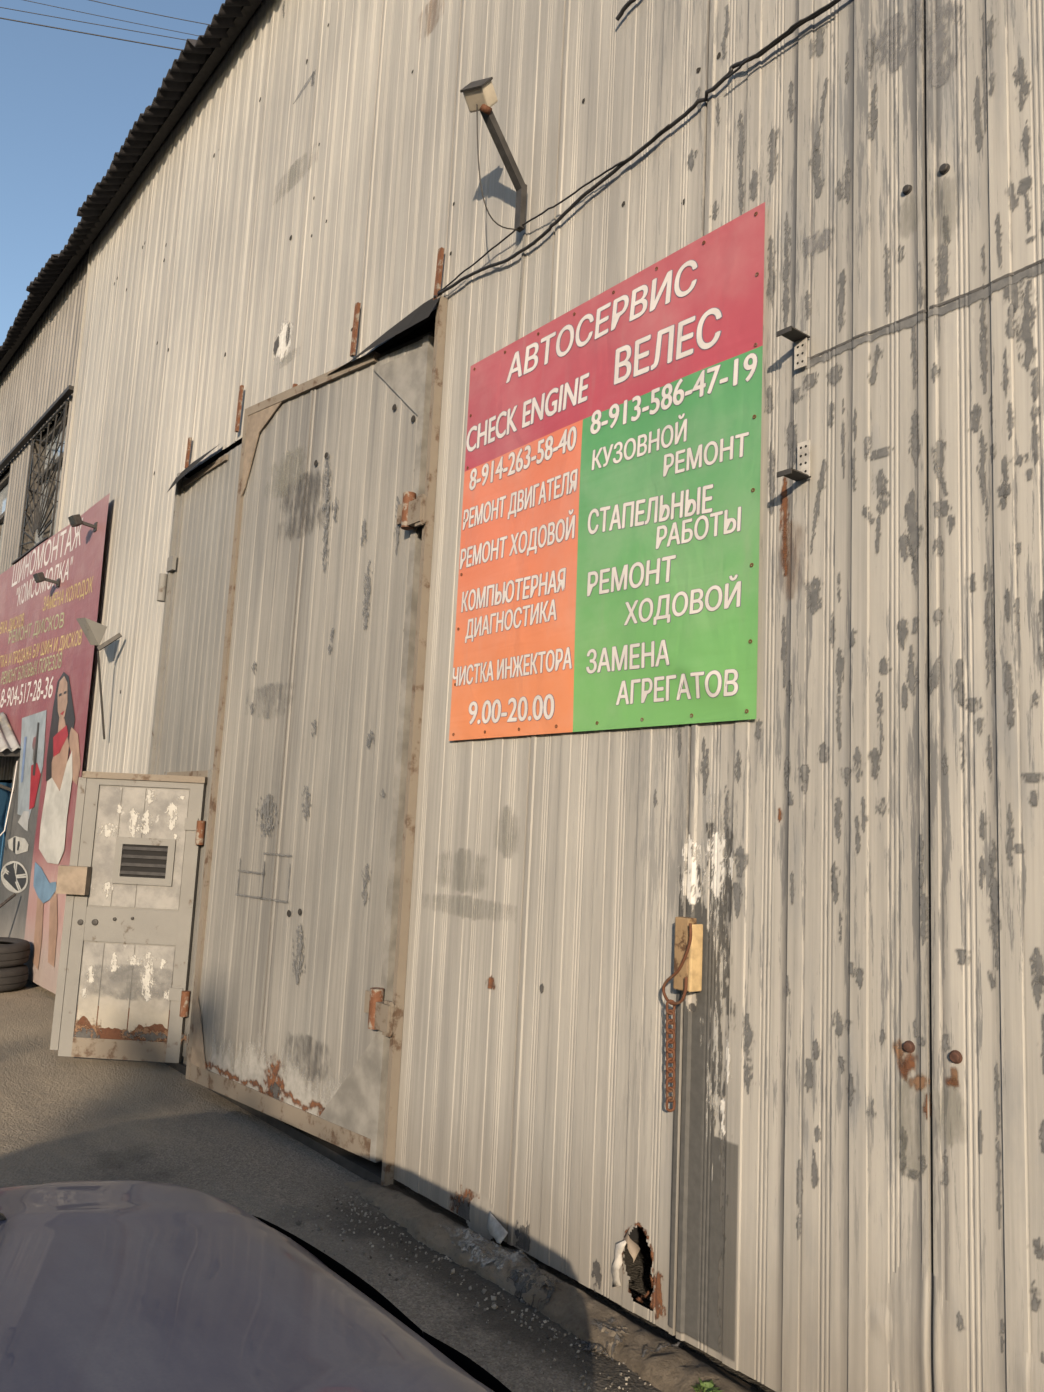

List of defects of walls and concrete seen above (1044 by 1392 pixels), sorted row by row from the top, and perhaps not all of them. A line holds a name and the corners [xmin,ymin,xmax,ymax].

rust [780,477,789,576]
peeling [784,573,891,853]
peeling [897,564,1020,774]
peeling [98,790,185,839]
peeling [979,804,1024,988]
rust [73,1021,102,1038]
peeling [80,952,169,1002]
rust [120,1028,189,1042]
rust [205,1060,325,1117]
peeling [668,737,753,1353]
rust [893,1040,959,1119]
peeling [1030,948,1044,1074]